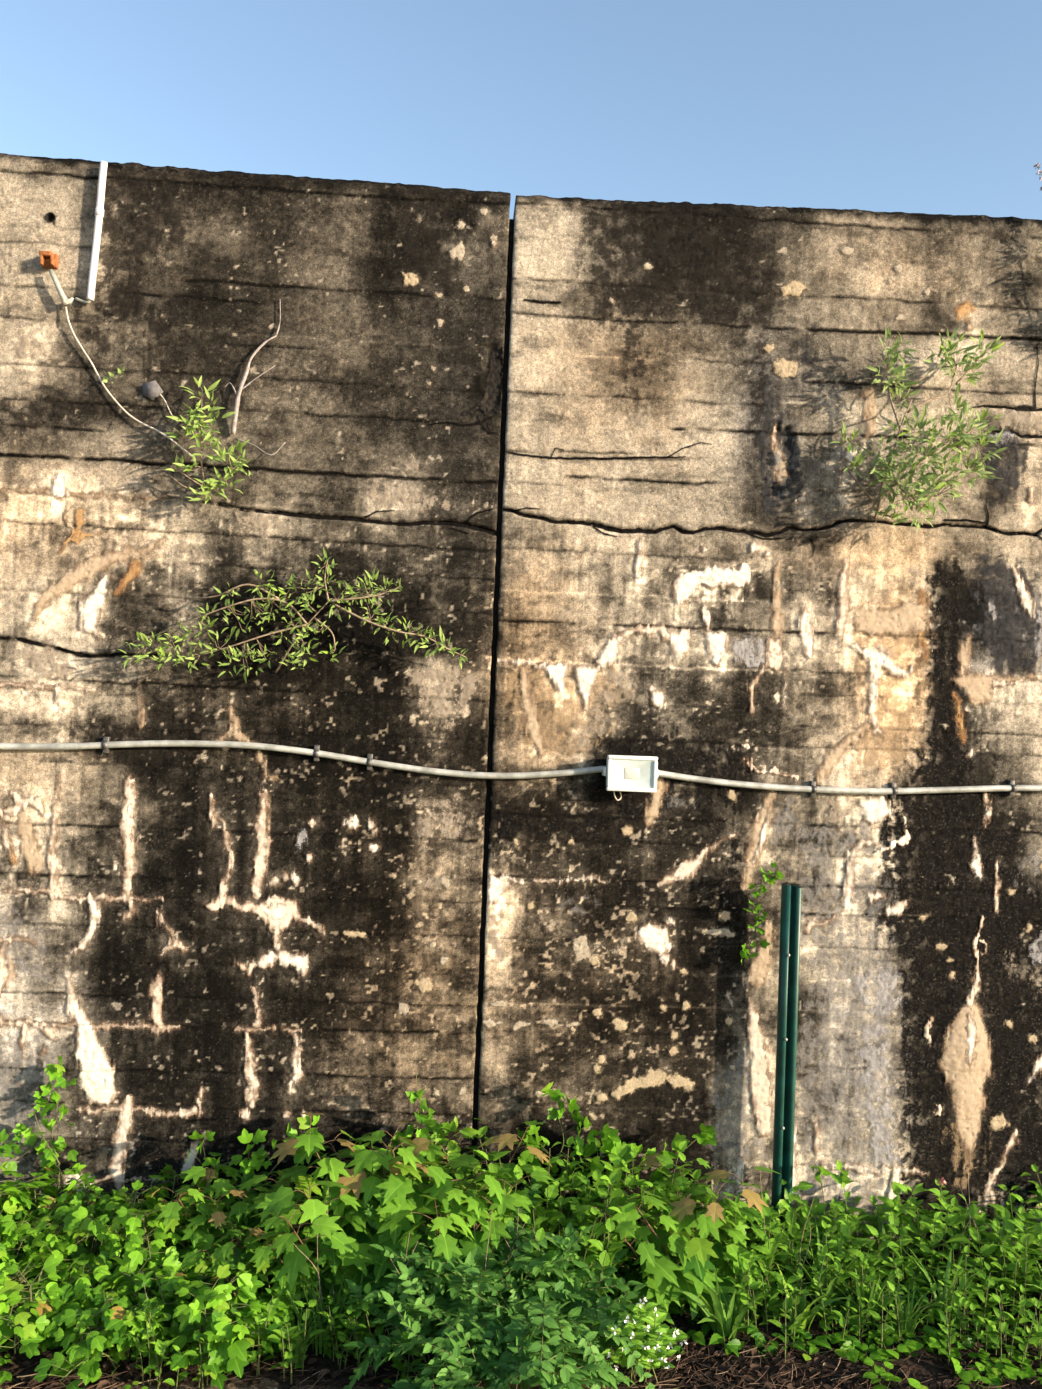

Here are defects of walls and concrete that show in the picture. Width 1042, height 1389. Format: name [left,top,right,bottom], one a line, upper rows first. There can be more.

damp [0,396,112,436]
damp [59,168,197,393]
damp [397,189,459,290]
damp [576,199,804,525]
crack [972,344,1042,454]
crack [217,503,1042,557]
damp [494,536,815,912]
damp [205,705,326,1121]
damp [485,871,606,965]
damp [572,917,676,970]
damp [742,920,776,1138]
damp [792,549,1042,1245]